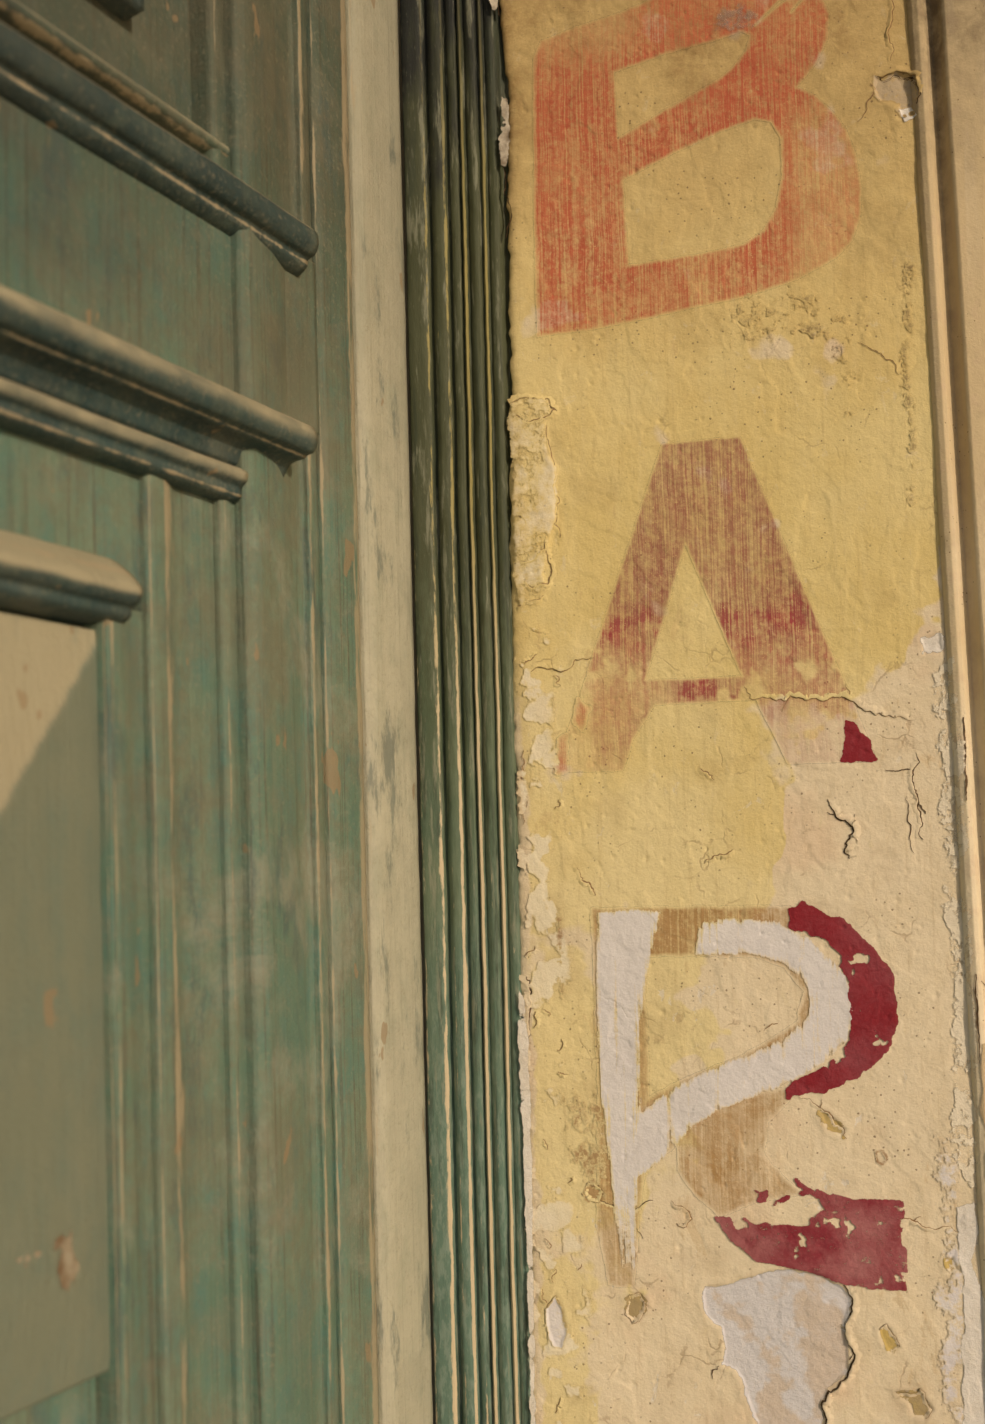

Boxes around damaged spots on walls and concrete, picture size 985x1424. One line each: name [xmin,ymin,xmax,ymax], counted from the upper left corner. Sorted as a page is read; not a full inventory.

spalling [857,64,923,122]
spalling [514,627,561,814]
crack [530,654,593,673]
crack [744,687,926,859]
spalling [517,799,594,1424]
peeling [17,1231,80,1291]
spalling [702,1269,851,1424]
crack [820,1285,863,1424]